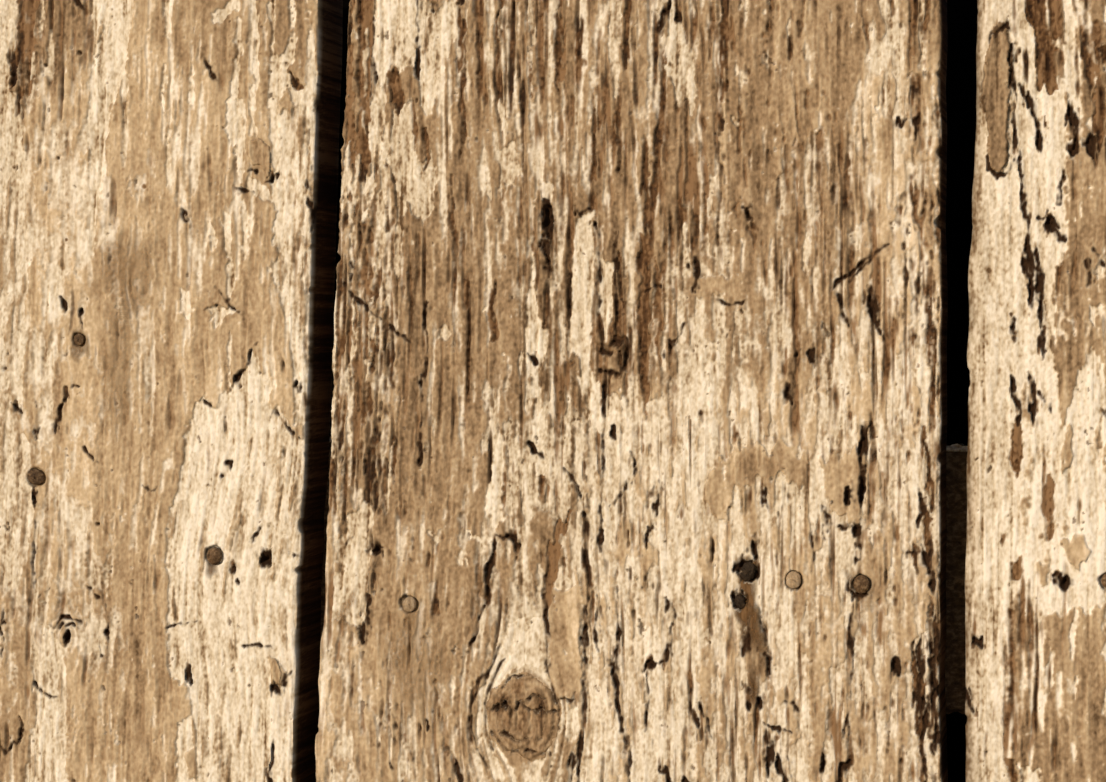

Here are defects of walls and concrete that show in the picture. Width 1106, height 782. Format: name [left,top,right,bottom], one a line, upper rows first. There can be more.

peeling [87,0,133,256]
peeling [340,0,458,279]
peeling [607,0,622,98]
peeling [653,0,697,116]
peeling [861,0,928,139]
peeling [0,0,34,589]
peeling [166,0,316,782]
peeling [331,297,377,447]
peeling [331,446,392,628]
peeling [457,210,939,782]
peeling [966,0,1106,782]
peeling [25,625,70,782]